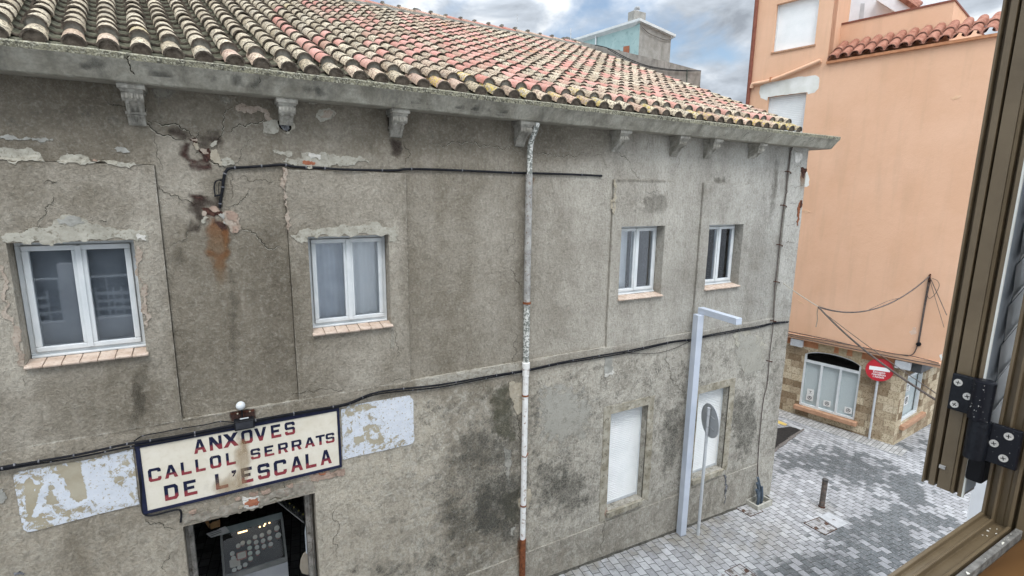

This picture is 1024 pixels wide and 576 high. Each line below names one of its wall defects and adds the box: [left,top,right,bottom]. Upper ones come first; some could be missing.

peeling [0,134,140,168]
peeling [1,214,152,329]
crack [109,104,287,251]
spalling [190,138,235,166]
rust [209,221,228,266]
spalling [201,206,241,233]
peeling [273,149,398,243]
leakage [532,384,598,453]
leakage [447,387,518,548]